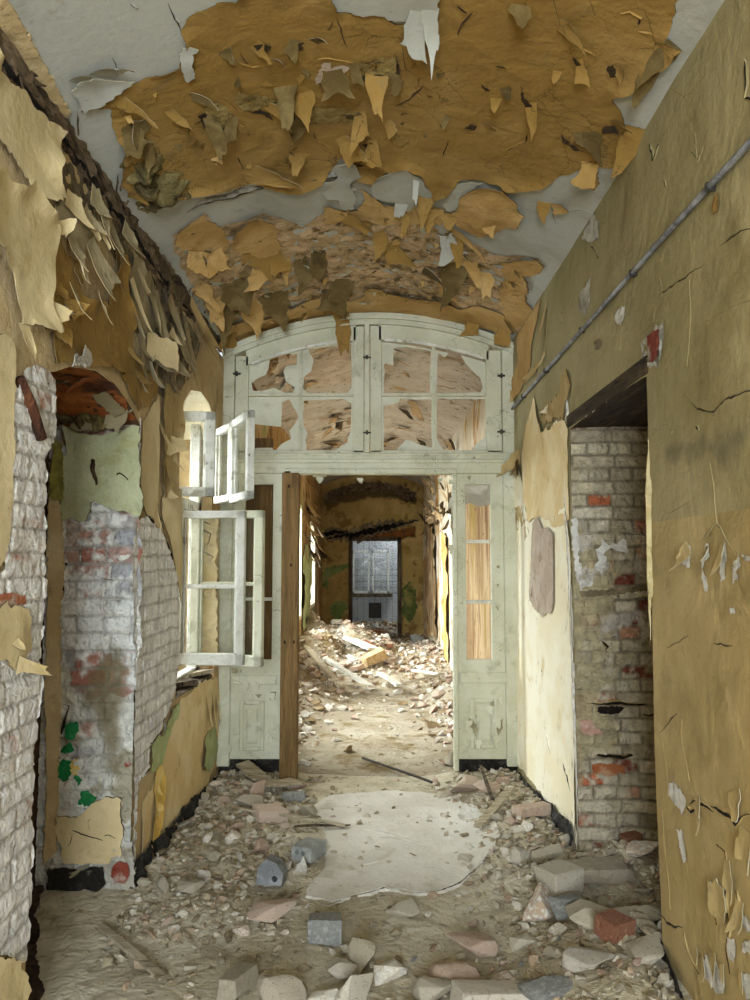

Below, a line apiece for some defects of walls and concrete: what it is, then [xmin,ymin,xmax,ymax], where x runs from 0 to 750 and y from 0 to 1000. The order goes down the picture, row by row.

peeling [69,0,682,402]
crack [563,400,571,422]
crack [685,389,750,414]
spalling [0,26,221,1000]
crack [322,518,419,544]
peeling [302,474,503,667]
peeling [497,369,653,896]
crack [544,488,654,850]
peeling [669,541,750,592]
crack [686,799,749,860]
peeling [695,789,750,999]
crack [715,889,741,974]